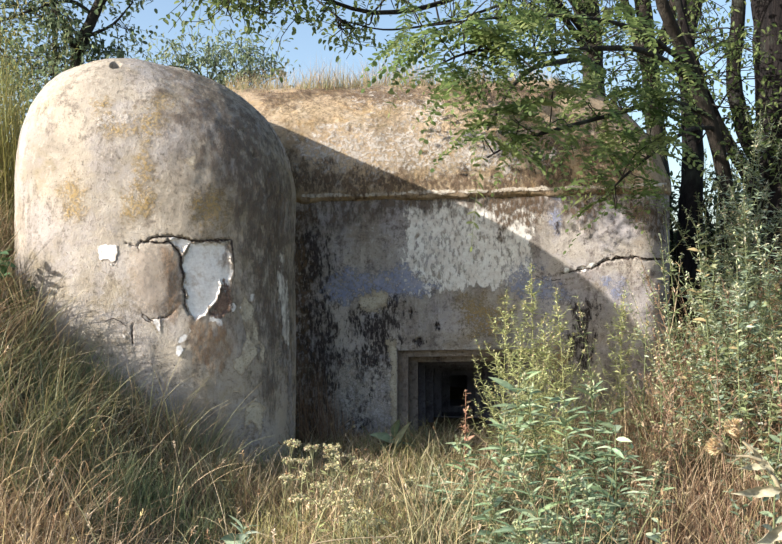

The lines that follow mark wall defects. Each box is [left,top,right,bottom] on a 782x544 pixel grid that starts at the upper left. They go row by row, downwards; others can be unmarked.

peeling [97,244,118,266]
spalling [168,237,265,376]
leakage [156,65,669,441]
peeling [301,185,605,303]
crack [536,255,669,281]